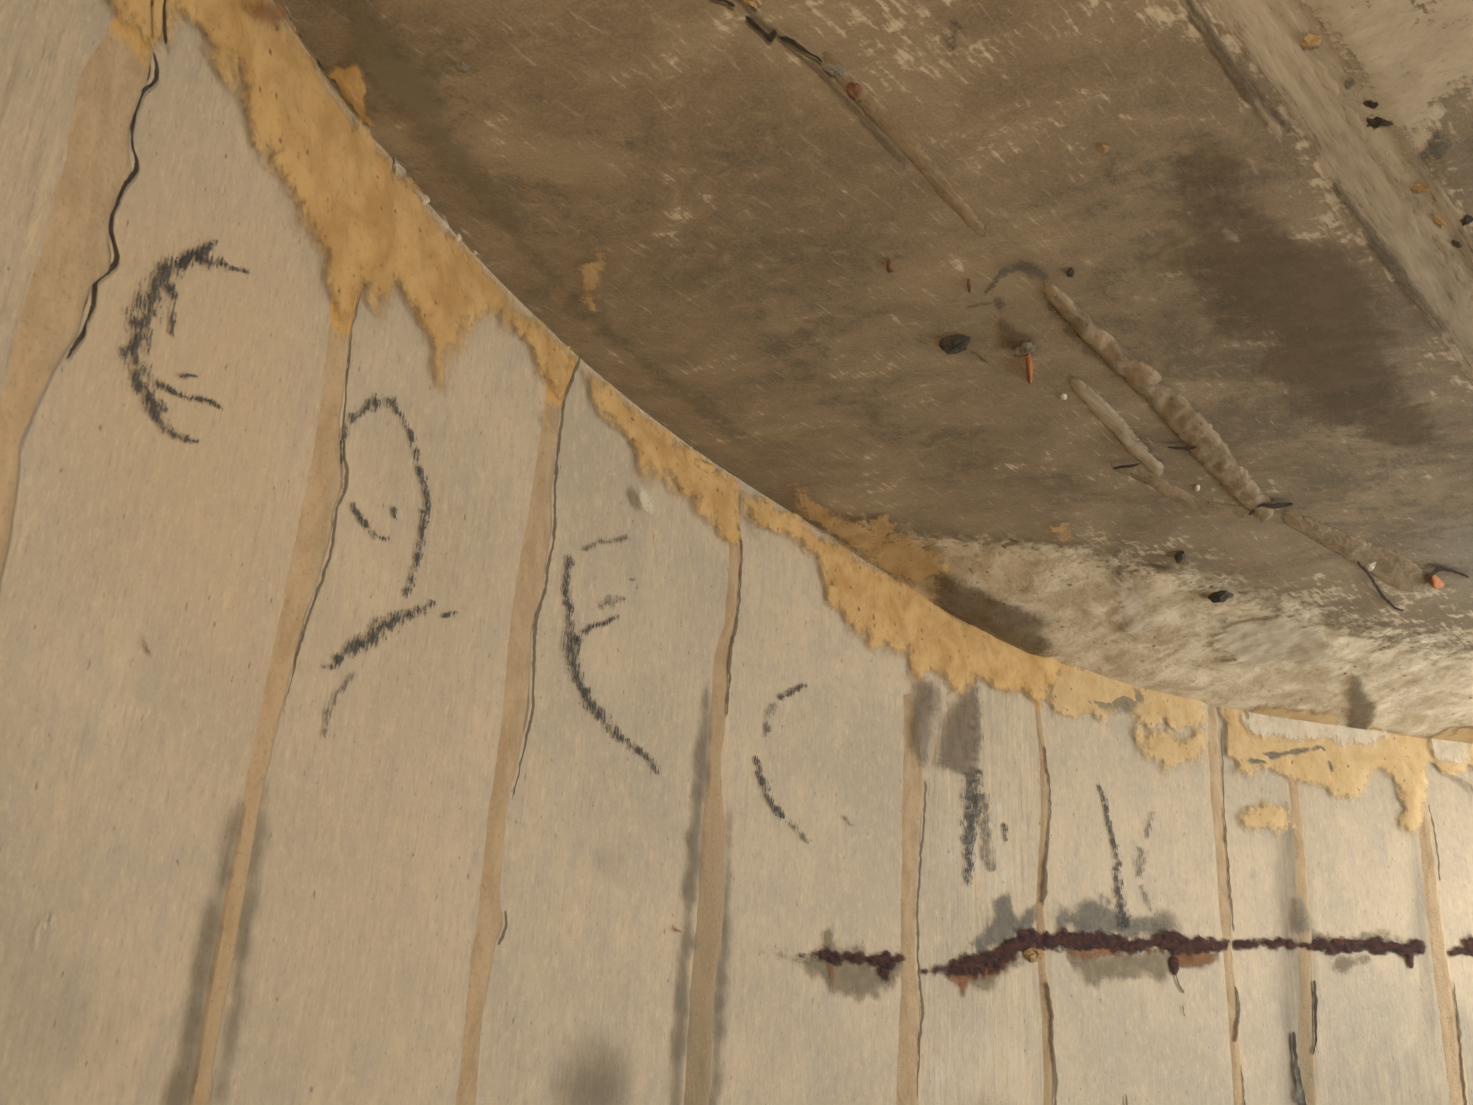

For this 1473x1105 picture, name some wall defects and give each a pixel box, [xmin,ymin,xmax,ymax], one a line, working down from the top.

crack [717,0,822,62]
crack [66,0,167,359]
water stain [913,682,981,774]
spalling [1249,745,1333,771]
water stain [684,737,706,902]
water stain [672,927,691,1062]
corrosion [799,930,905,999]
corrosion [922,896,1426,996]
crack [1292,981,1318,1105]
corrosion [1448,935,1473,956]